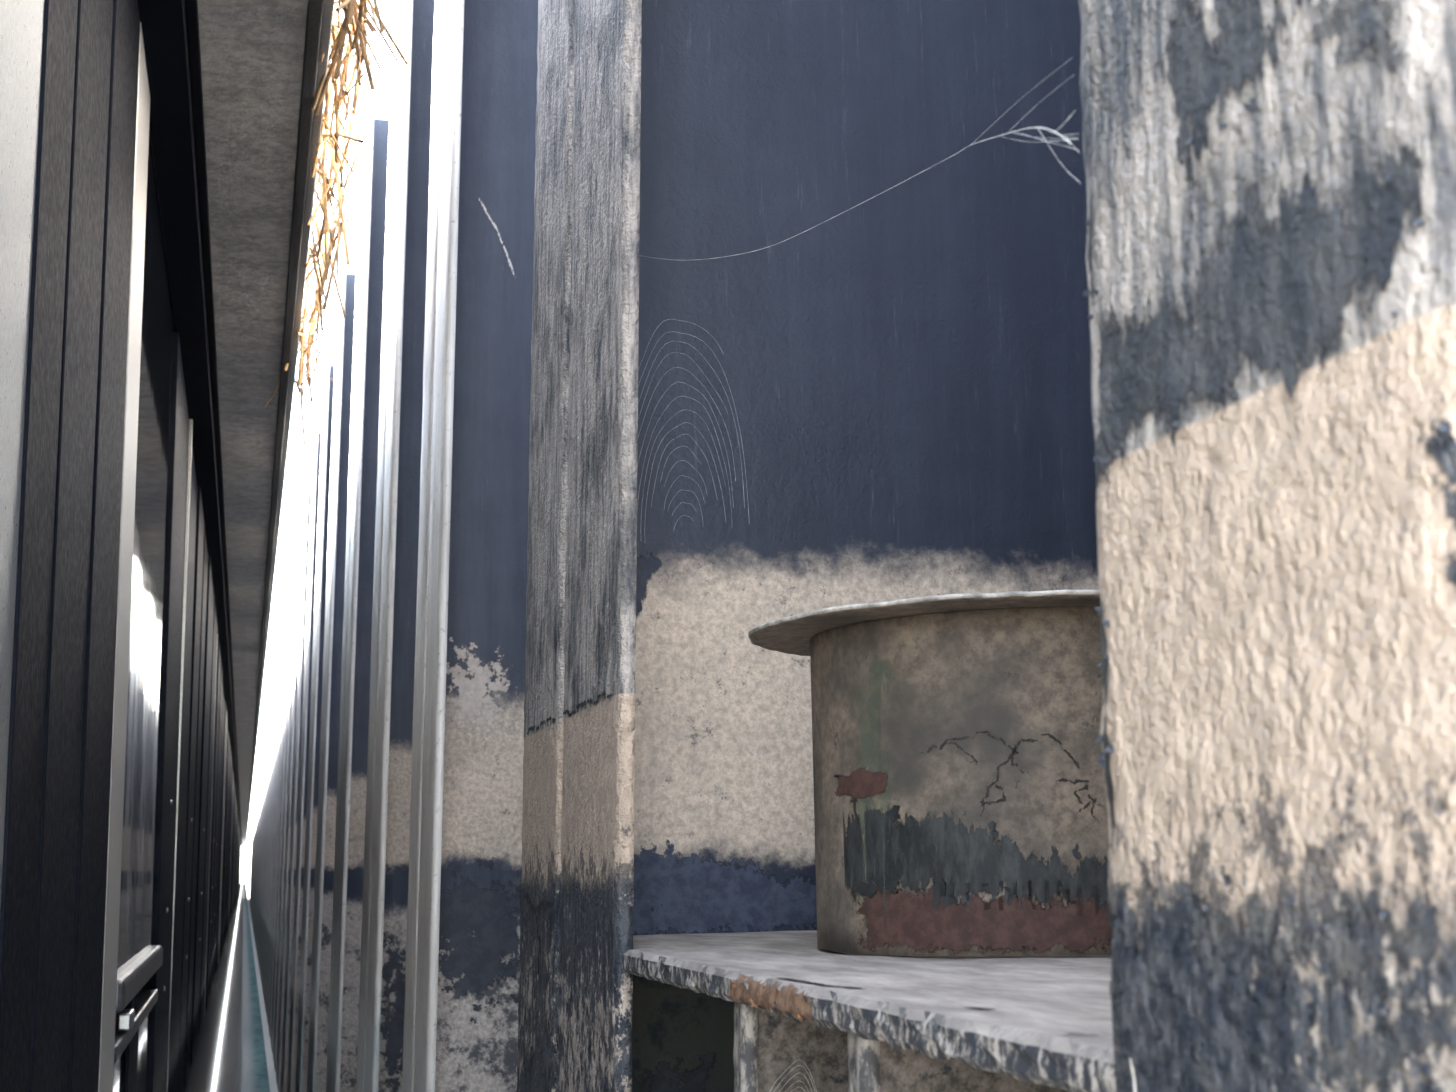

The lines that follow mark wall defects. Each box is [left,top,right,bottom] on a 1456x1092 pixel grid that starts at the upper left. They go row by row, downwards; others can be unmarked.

peeling [445,637,521,748]
crack [921,731,1097,818]
damp [633,840,817,935]
peeling [438,854,558,1092]